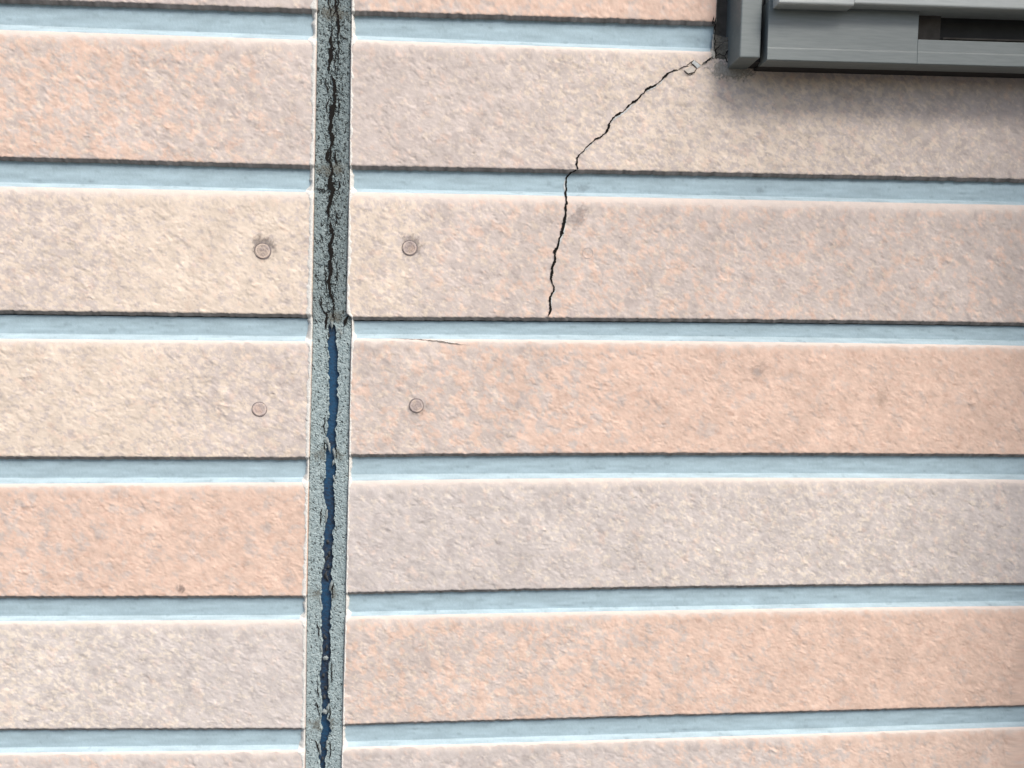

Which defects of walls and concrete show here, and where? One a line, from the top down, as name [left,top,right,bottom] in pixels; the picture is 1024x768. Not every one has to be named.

crack [306,0,352,768]
crack [548,17,728,316]